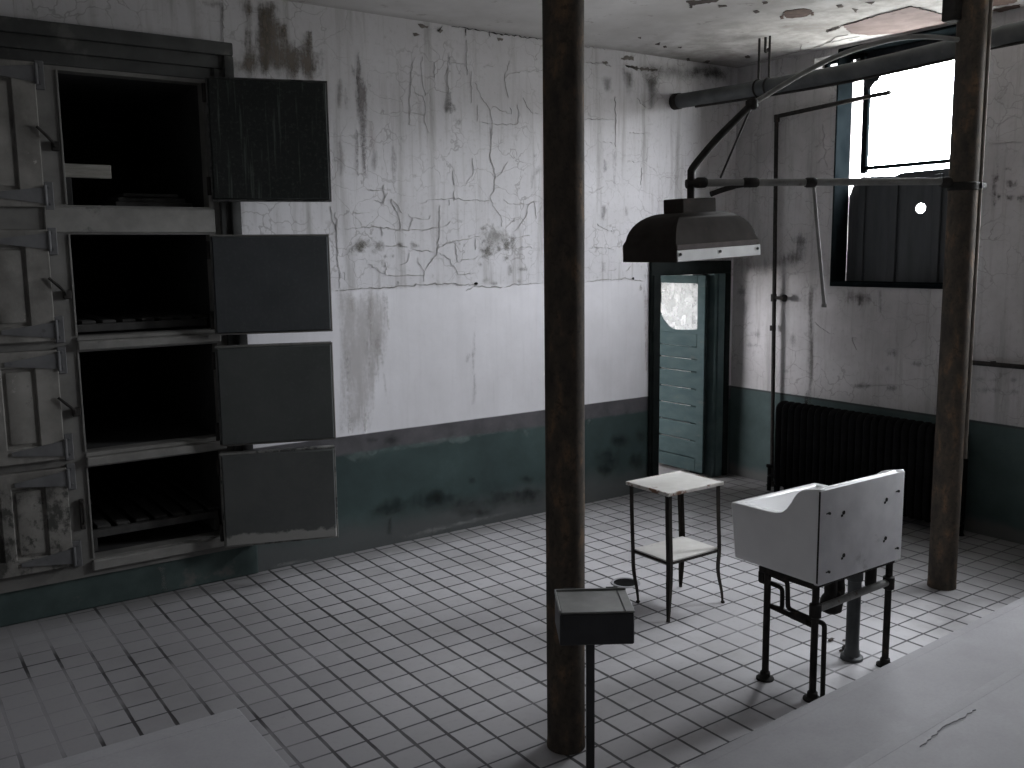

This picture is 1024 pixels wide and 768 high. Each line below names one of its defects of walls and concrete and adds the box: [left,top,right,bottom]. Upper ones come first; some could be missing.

water stain [243,3,314,77]
peeling [780,8,814,20]
flaking render [826,2,948,36]
water stain [357,59,366,169]
crack [331,26,540,291]
crack [585,98,645,147]